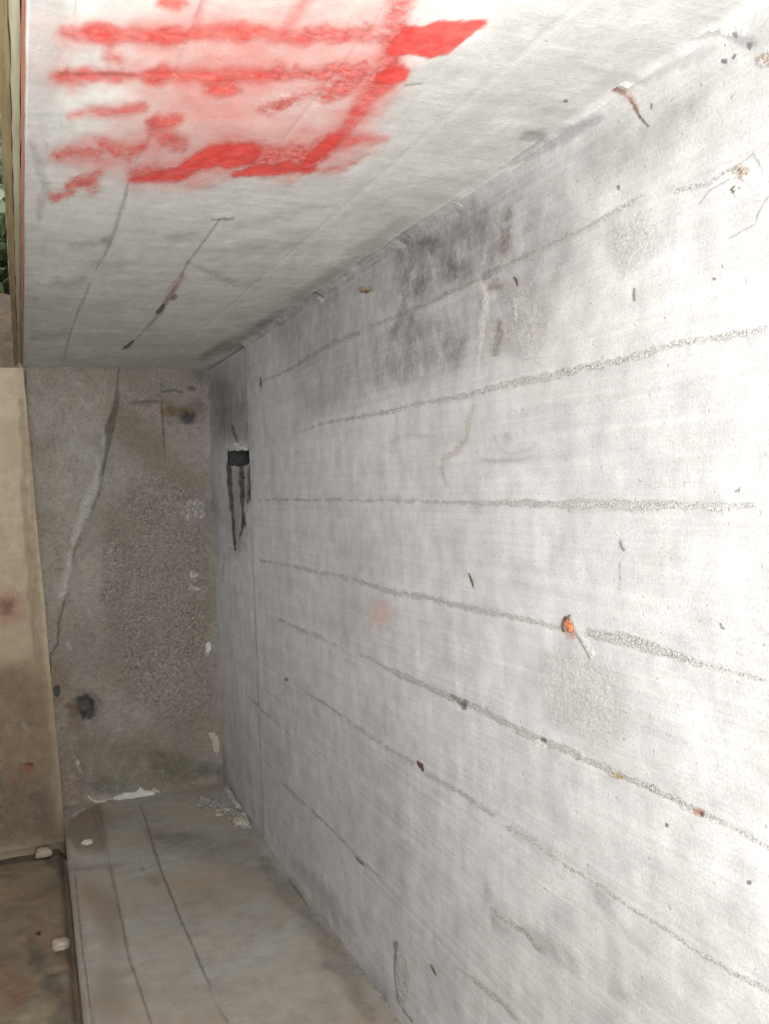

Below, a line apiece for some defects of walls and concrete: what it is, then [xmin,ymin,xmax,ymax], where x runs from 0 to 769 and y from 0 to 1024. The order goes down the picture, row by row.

leakage [227,463,251,550]